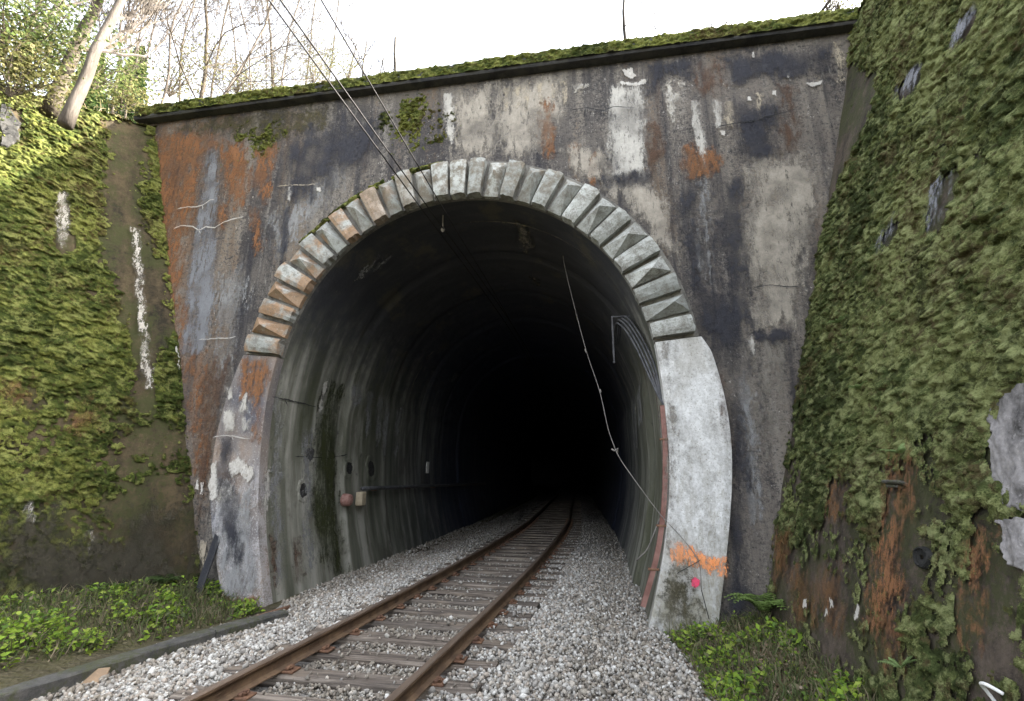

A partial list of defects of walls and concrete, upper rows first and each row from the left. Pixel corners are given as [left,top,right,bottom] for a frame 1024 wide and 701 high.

crack [174,199,243,232]
rust [683,142,724,179]
rust [155,130,280,512]
water stain [560,41,846,615]
rust [862,453,915,646]
rust [957,527,999,647]
spalling [986,383,1024,571]